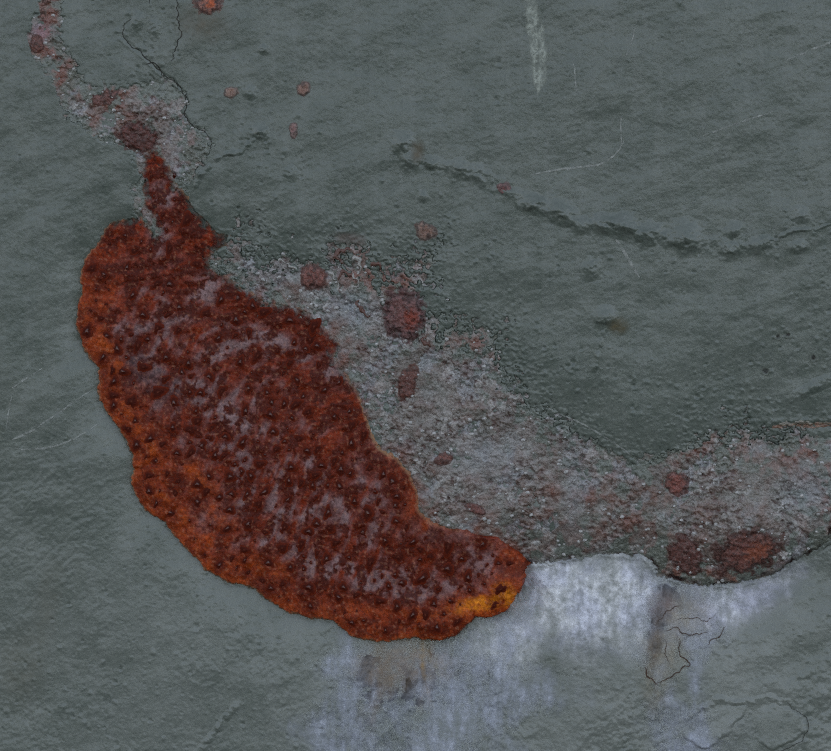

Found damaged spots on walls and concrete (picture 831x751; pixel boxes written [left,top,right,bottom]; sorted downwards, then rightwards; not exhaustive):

corrosion [192,0,224,15]
peeling [26,0,215,240]
corrosion [76,150,531,642]
peeling [204,216,831,587]
crack [772,418,831,430]
damp [485,561,657,723]
damp [673,577,789,646]